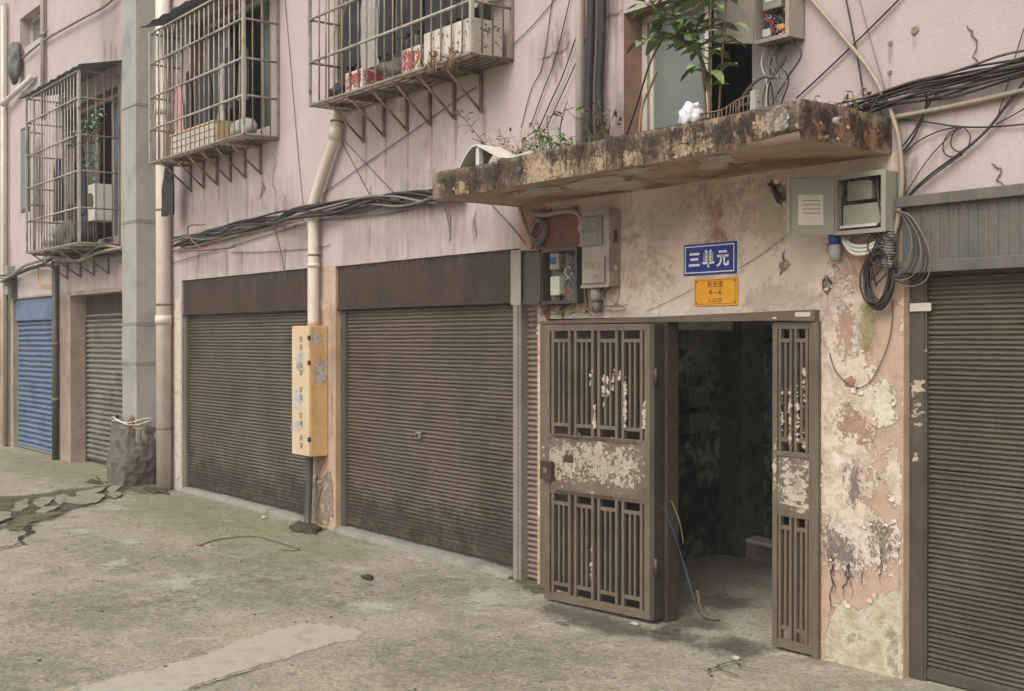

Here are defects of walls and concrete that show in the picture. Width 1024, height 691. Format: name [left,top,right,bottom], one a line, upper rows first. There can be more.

water stain [544,108,761,173]
water stain [799,99,892,149]
peeling [750,235,902,679]
spalling [311,471,333,526]
crack [0,531,31,548]
crack [828,549,883,619]